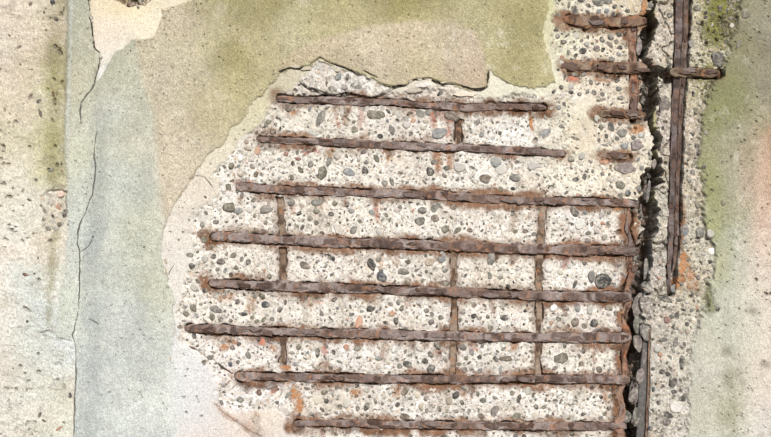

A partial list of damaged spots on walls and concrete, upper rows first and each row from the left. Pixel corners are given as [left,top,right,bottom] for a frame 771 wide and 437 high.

peeling [87,0,194,84]
corrosion [552,0,647,45]
corrosion [269,131,364,156]
corrosion [408,97,555,133]
corrosion [559,59,655,133]
crack [72,0,100,437]
corrosion [261,232,518,263]
corrosion [282,180,564,216]
spalling [160,0,750,437]
corrosion [273,280,465,303]
corrosion [396,195,640,437]
corrosion [239,323,574,437]